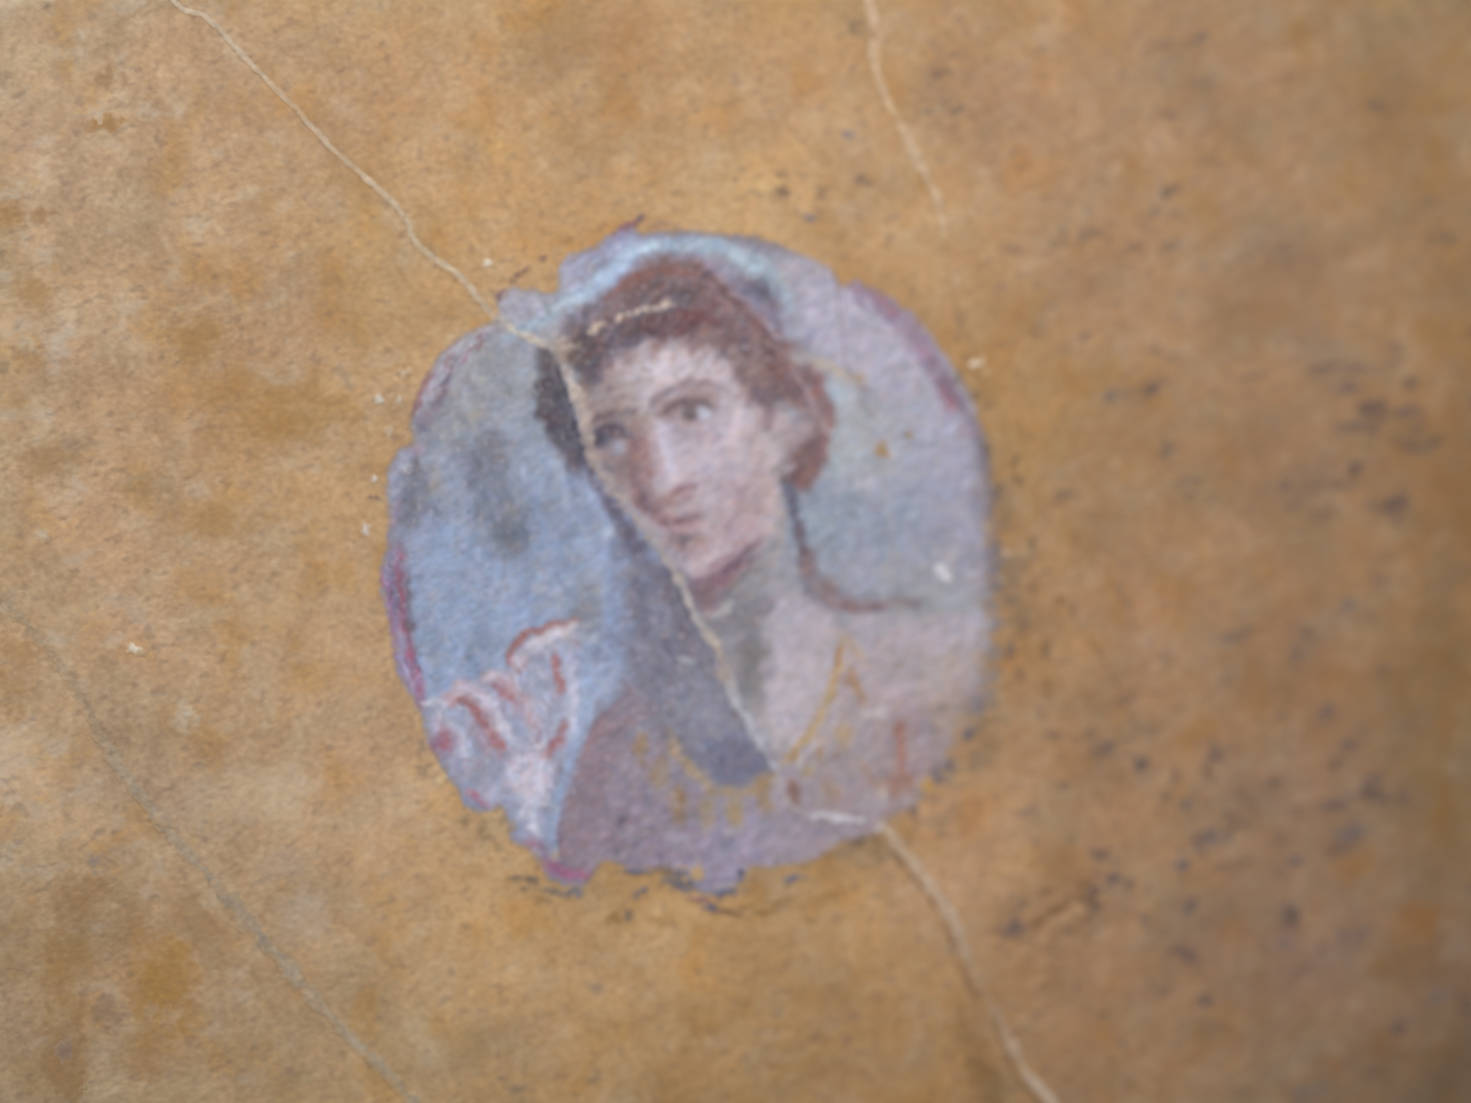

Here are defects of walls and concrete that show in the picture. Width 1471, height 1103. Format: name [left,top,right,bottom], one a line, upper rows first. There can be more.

crack [0,584,425,1103]
crack [170,0,1061,1103]
crack [842,0,1128,703]